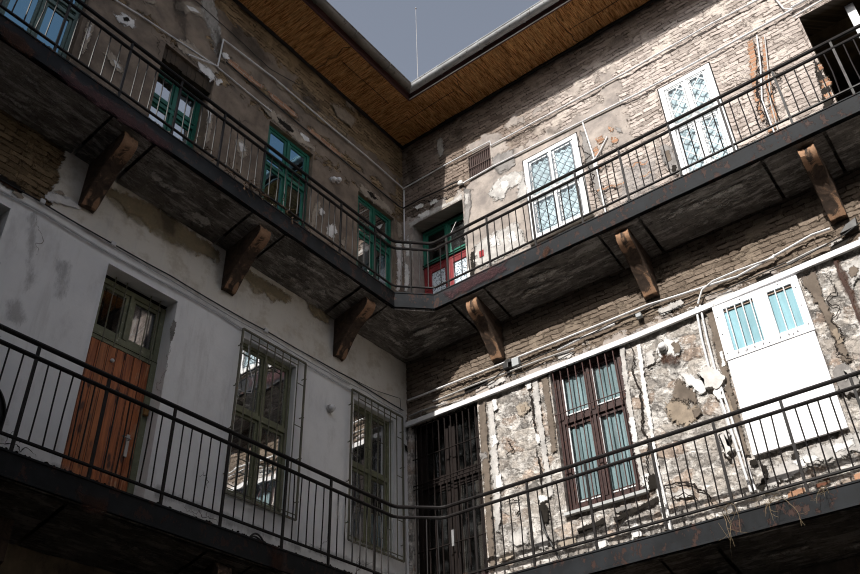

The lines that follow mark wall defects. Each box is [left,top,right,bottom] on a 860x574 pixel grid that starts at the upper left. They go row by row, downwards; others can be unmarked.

flaking render [747,37,782,134]
flaking render [0,174,25,199]
spalling [45,190,81,209]
peeling [106,188,224,265]
peeling [499,169,528,202]
peeling [645,349,655,366]
peeling [663,372,735,427]
crack [629,343,713,529]